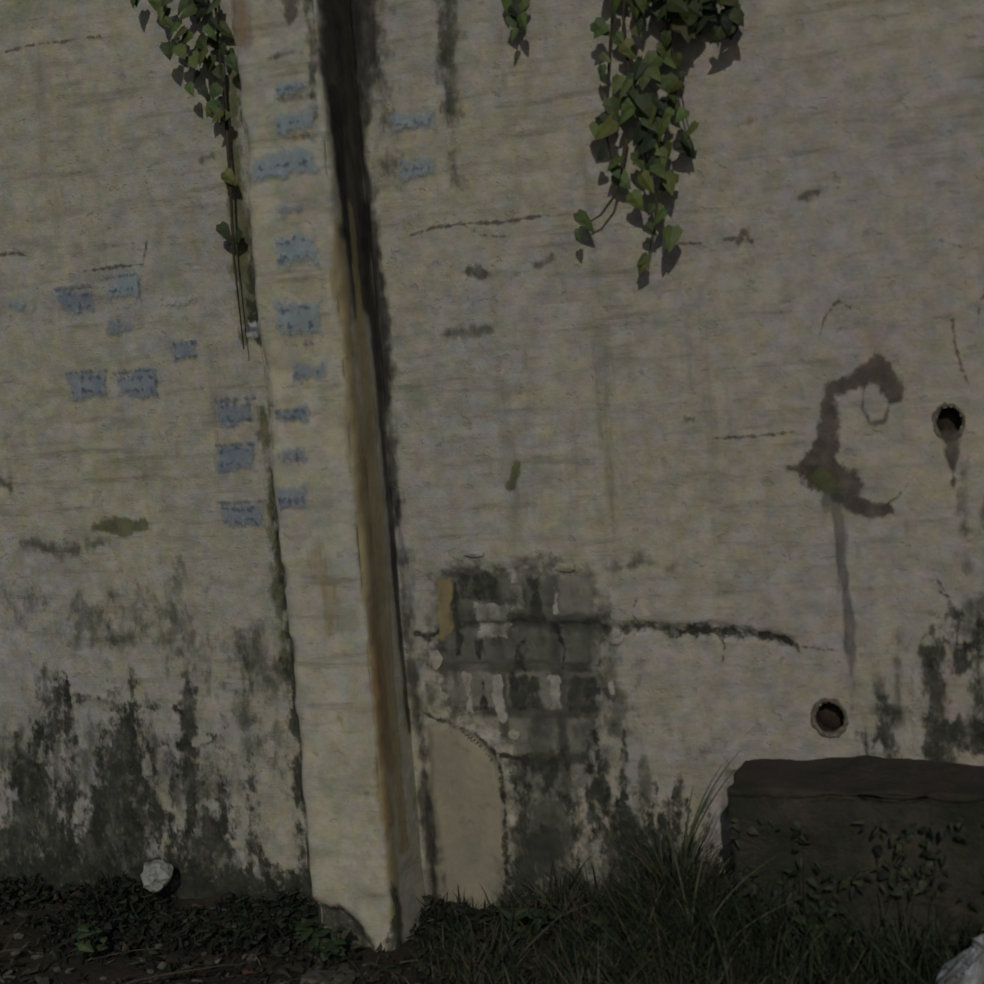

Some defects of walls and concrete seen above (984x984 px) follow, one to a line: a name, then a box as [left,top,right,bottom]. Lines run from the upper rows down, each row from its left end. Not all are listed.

water stain [246,256,264,365]
water stain [787,354,904,517]
water stain [941,429,960,487]
water stain [0,475,313,905]
crack [414,624,480,642]
flaking render [428,550,624,857]
crack [555,601,807,669]
water stain [862,600,984,763]
water stain [496,714,734,918]